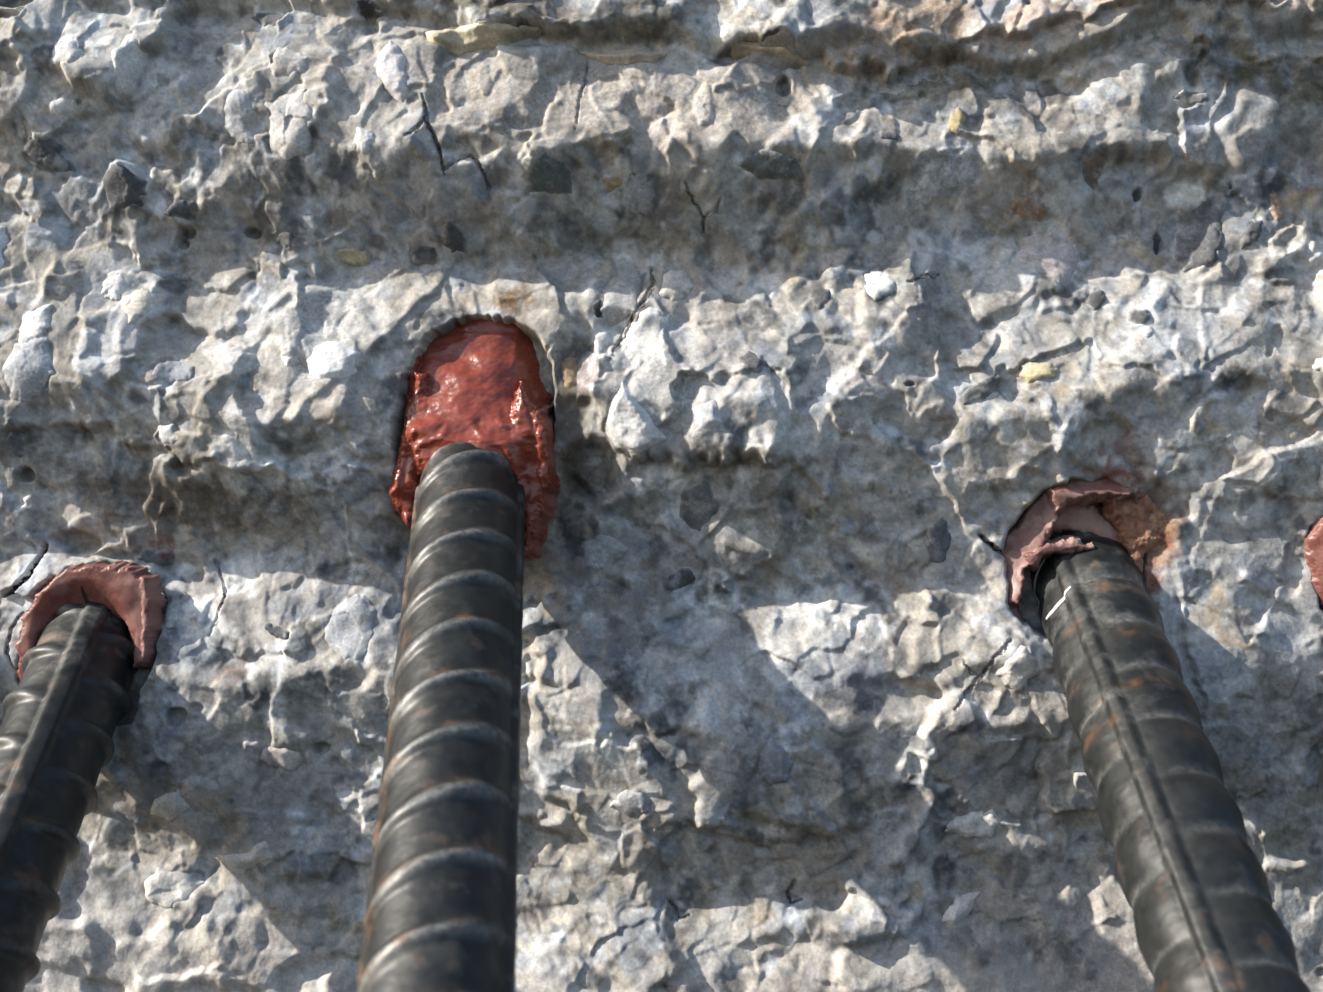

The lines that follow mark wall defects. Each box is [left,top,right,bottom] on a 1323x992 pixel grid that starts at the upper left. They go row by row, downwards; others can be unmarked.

rust [1133,492,1184,595]